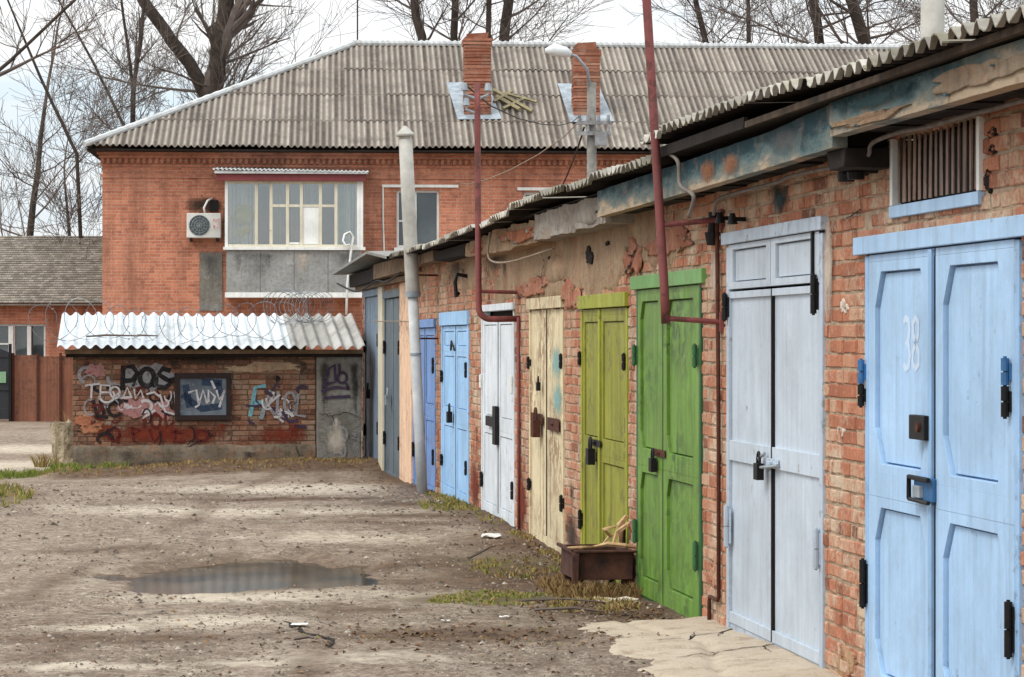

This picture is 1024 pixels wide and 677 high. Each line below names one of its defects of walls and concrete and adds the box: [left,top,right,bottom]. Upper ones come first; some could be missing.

peeling [932,53,1024,96]
peeling [828,104,911,129]
hole [585,245,594,265]
peeling [622,226,693,276]
peeling [515,276,548,298]
peeling [559,277,581,309]